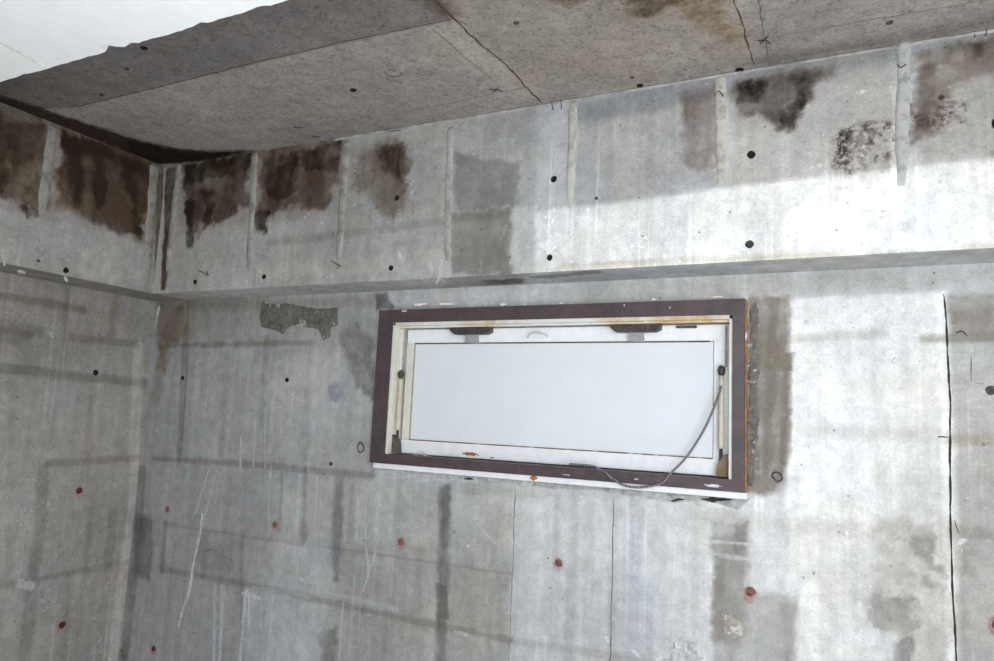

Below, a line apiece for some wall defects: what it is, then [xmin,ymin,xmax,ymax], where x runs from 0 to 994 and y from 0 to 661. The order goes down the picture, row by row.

water stain [627,0,685,18]
water stain [738,71,813,130]
water stain [838,121,895,171]
water stain [55,129,342,247]
water stain [378,144,409,206]
peeling [259,301,338,340]
spalling [664,636,703,661]